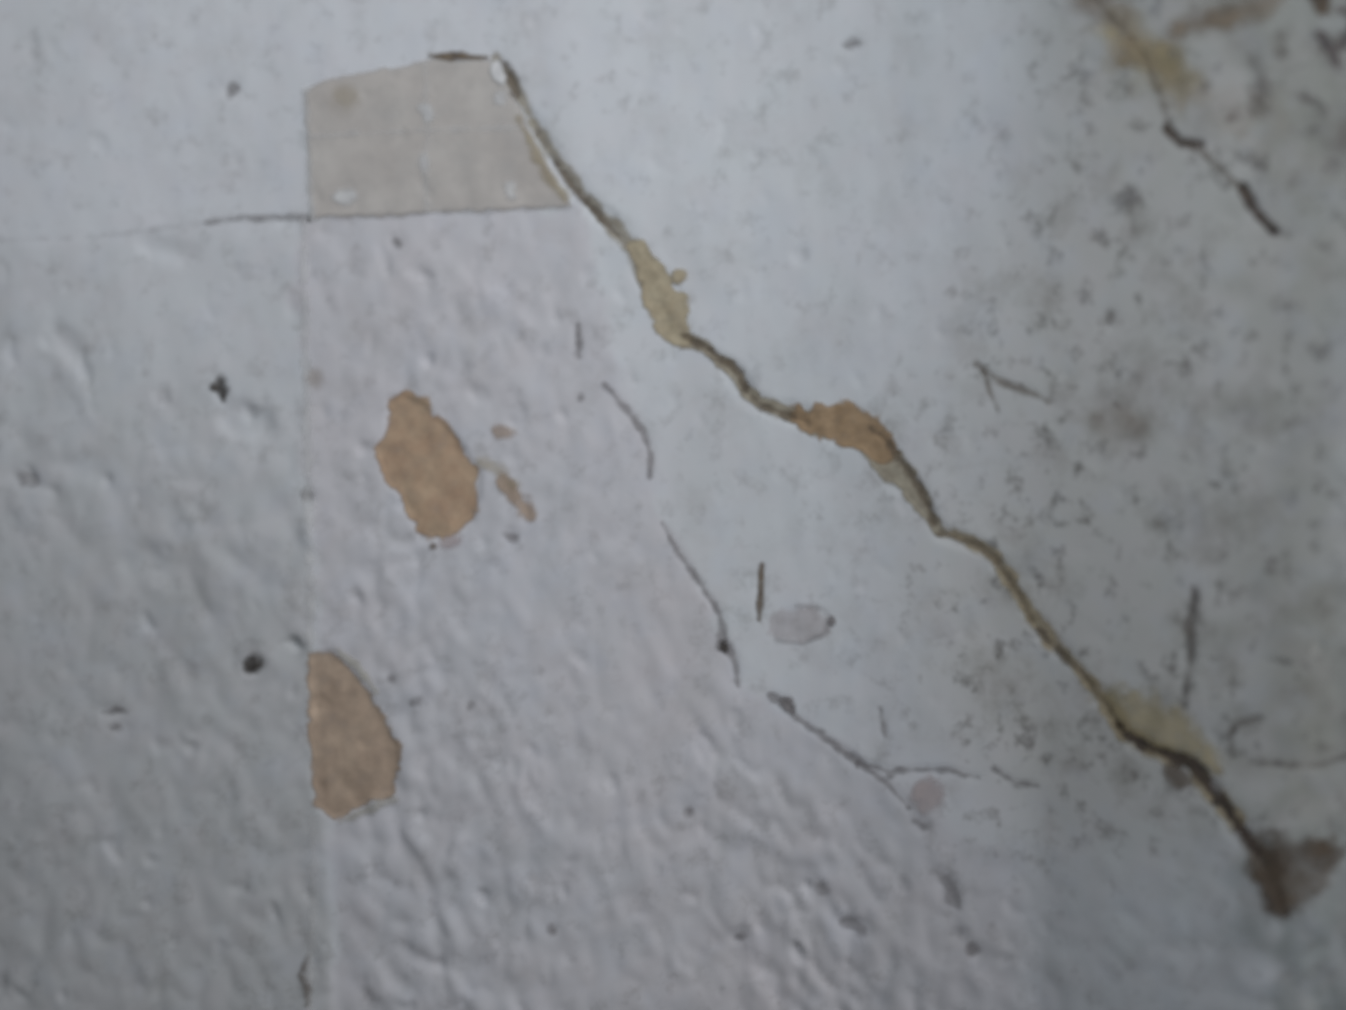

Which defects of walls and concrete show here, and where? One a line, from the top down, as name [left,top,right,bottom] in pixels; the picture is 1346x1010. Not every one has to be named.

crack [1239,183,1279,235]
peeling [375,391,478,548]
peeling [497,475,535,520]
crack [491,54,1262,857]
peeling [307,653,402,819]